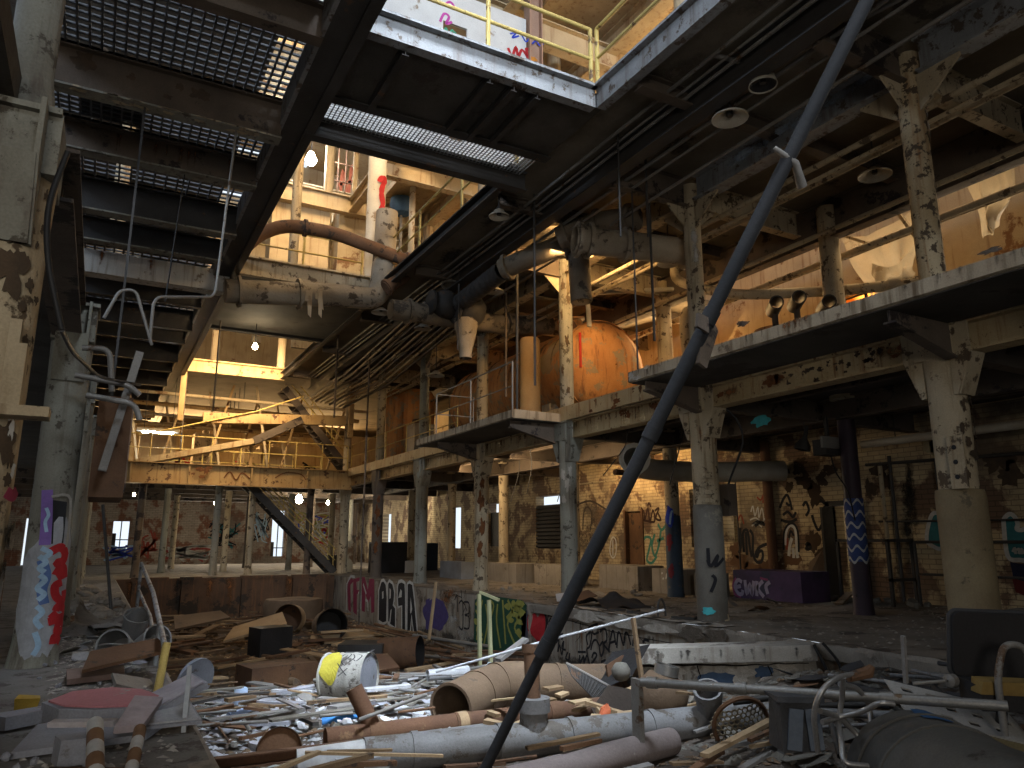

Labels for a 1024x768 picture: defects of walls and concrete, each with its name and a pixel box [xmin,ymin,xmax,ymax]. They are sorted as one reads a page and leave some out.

peeling [0,225,44,320]
peeling [777,343,891,385]